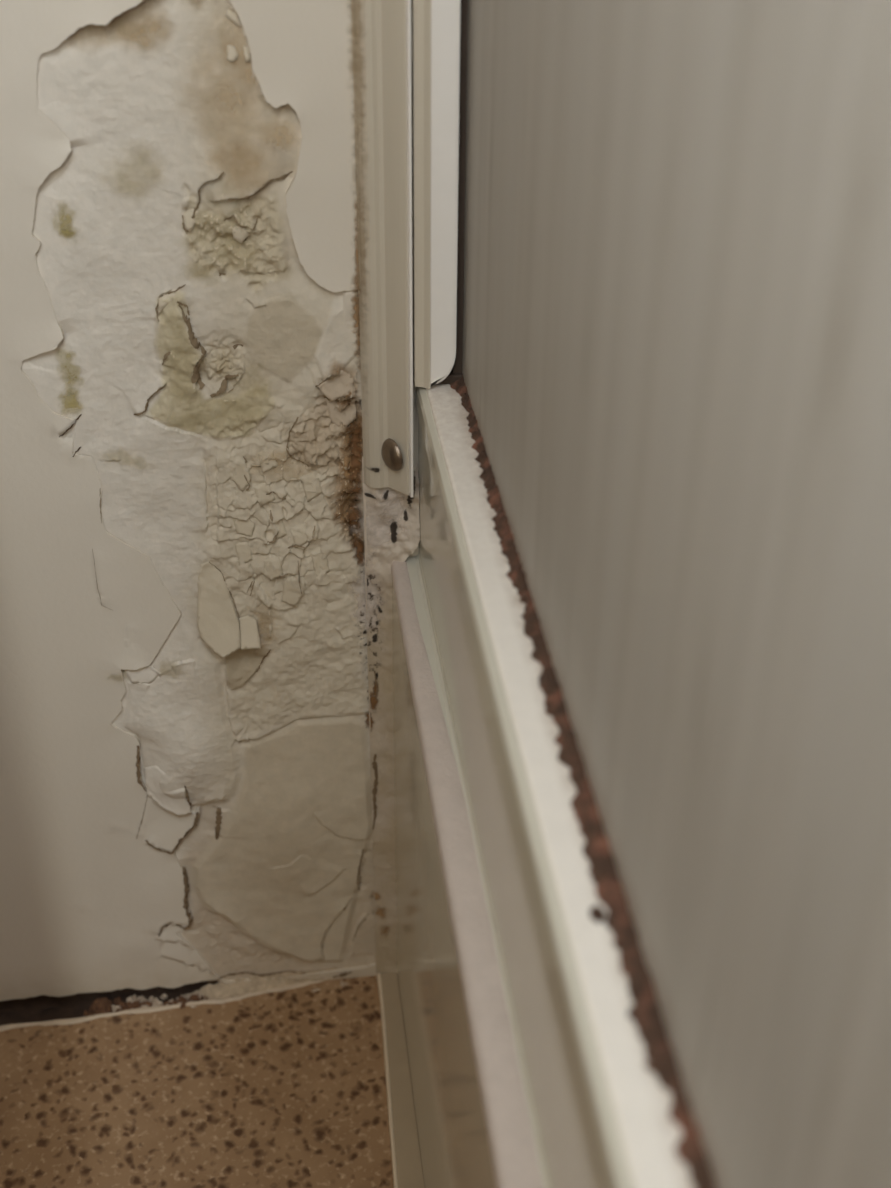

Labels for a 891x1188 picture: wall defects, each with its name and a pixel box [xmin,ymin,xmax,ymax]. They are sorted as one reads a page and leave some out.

peeling [21,0,365,703]
peeling [175,740,249,983]
peeling [291,831,376,971]